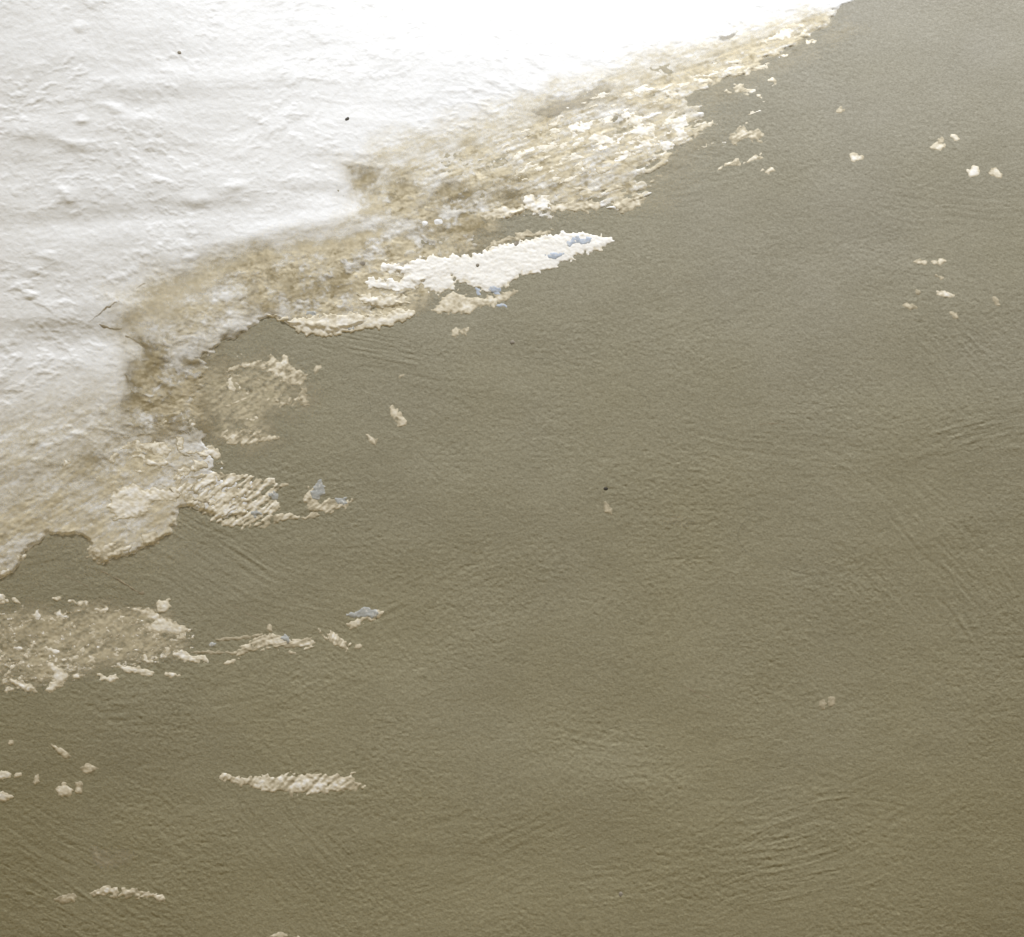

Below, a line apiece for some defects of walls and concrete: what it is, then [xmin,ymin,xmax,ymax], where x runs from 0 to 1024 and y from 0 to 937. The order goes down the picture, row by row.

peeling [687,23,817,99]
peeling [718,122,775,174]
peeling [966,165,1003,178]
peeling [480,185,647,221]
peeling [267,228,615,338]
peeling [224,354,322,408]
peeling [95,416,354,530]
peeling [5,596,384,693]
peeling [0,770,40,802]
peeling [55,763,99,797]
peeling [219,771,366,797]
peeling [90,885,165,902]